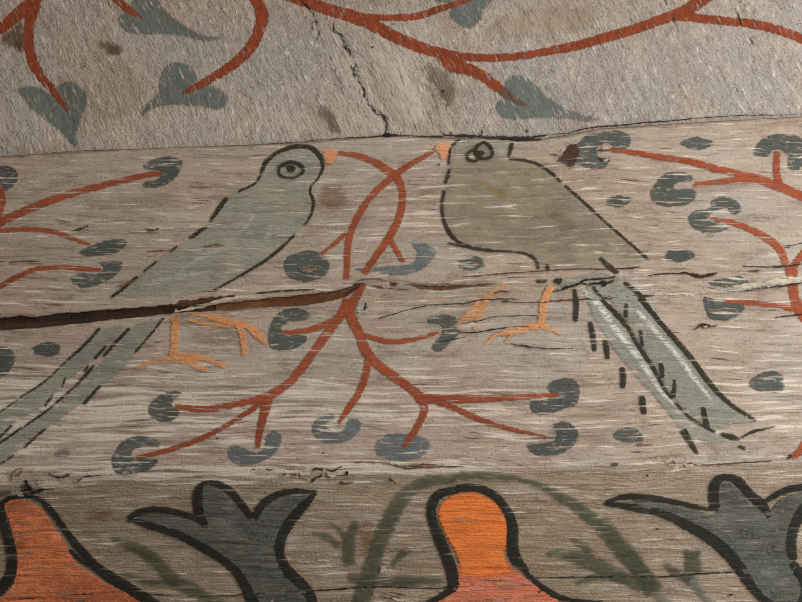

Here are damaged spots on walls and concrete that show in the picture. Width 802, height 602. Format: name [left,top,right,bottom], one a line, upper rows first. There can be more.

crack [302,0,388,133]
crack [464,266,641,277]
crack [743,264,802,292]
crack [374,294,670,349]